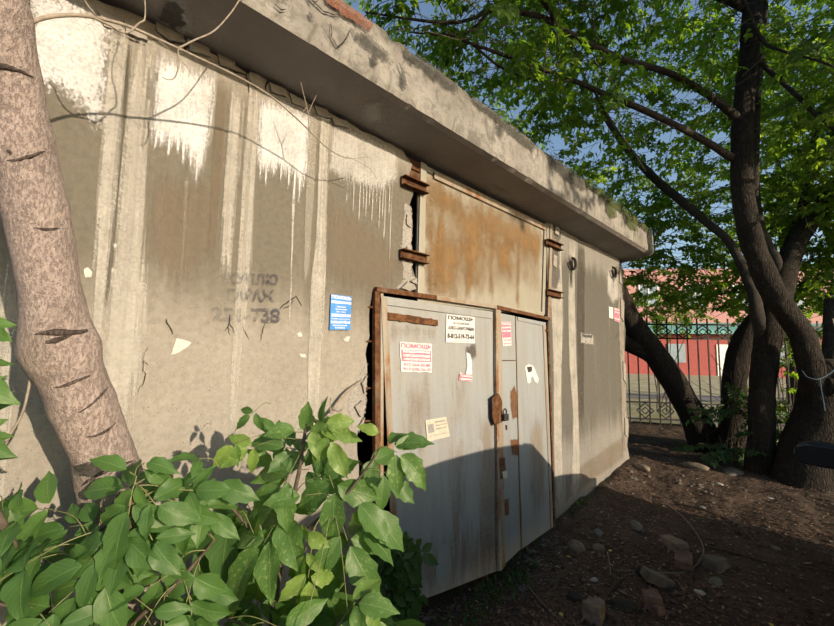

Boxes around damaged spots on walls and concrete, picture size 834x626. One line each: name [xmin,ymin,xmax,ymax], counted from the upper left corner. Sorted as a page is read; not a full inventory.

flaking render [327,0,373,31]
spalling [97,0,349,129]
water stain [30,0,397,434]
spalling [397,203,418,291]
crack [225,296,302,341]
corrosion [511,439,519,456]